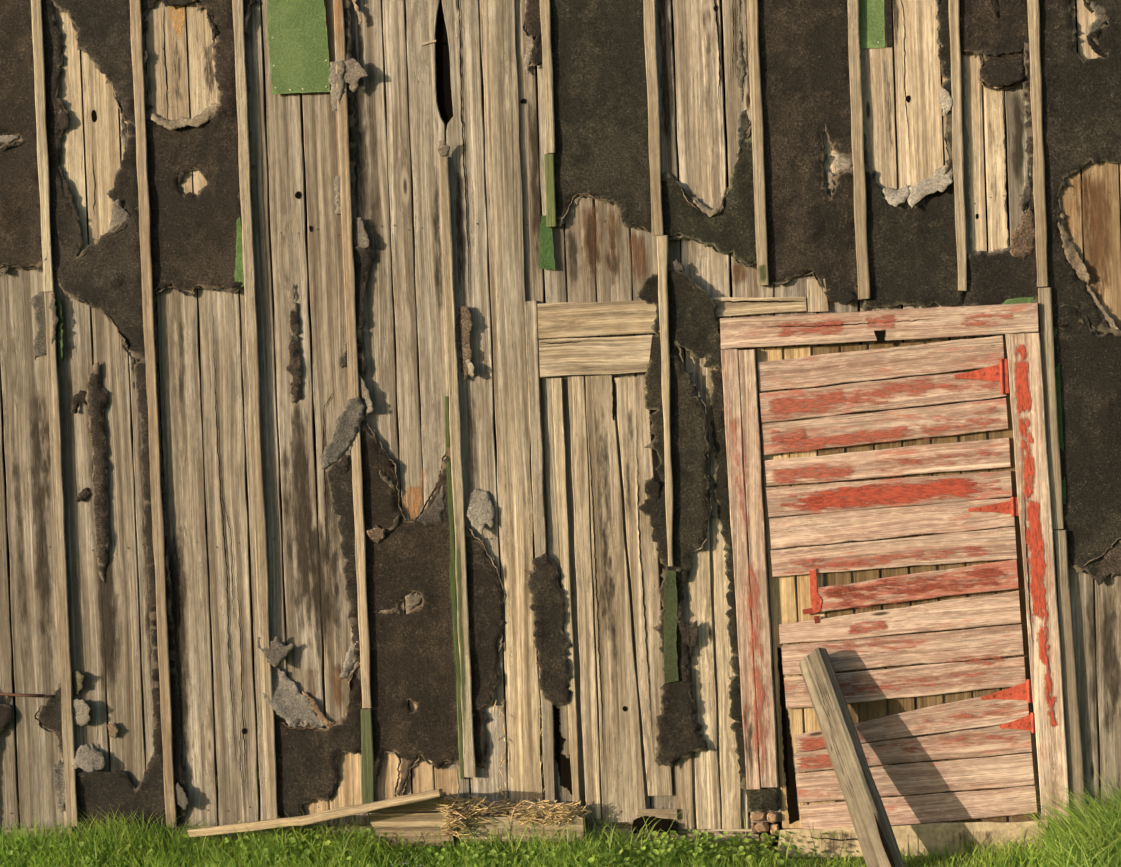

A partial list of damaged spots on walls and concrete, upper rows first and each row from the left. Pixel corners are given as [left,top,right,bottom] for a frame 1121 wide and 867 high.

peeling [145,0,221,130]
peeling [1070,0,1108,61]
peeling [52,1,131,256]
peeling [178,170,207,196]
peeling [823,126,853,196]
peeling [860,0,1036,259]
peeling [1058,160,1121,331]
peeling [824,288,857,305]
peeling [769,377,998,452]
peeling [773,448,1001,511]
peeling [1014,344,1057,727]
peeling [785,546,1006,608]